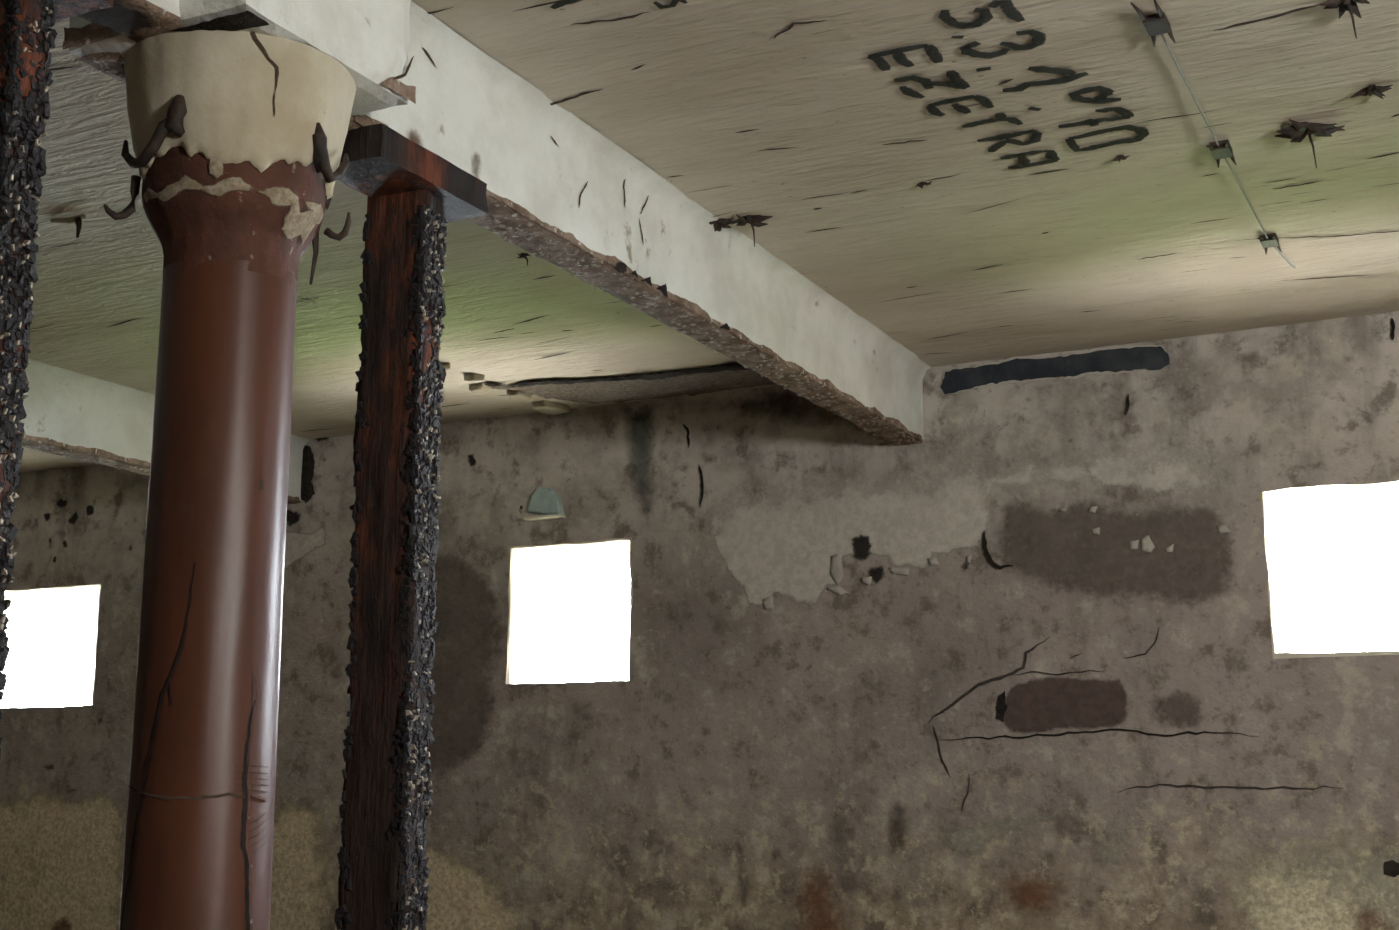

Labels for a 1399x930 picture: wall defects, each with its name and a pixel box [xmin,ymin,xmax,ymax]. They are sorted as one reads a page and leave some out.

spalling [355,115,389,127]
flaking render [143,157,323,246]
crack [1285,230,1399,238]
spalling [464,189,923,446]
flaking render [710,452,1233,610]
crack [120,562,270,930]
crack [928,629,1259,812]
crack [1117,784,1334,793]